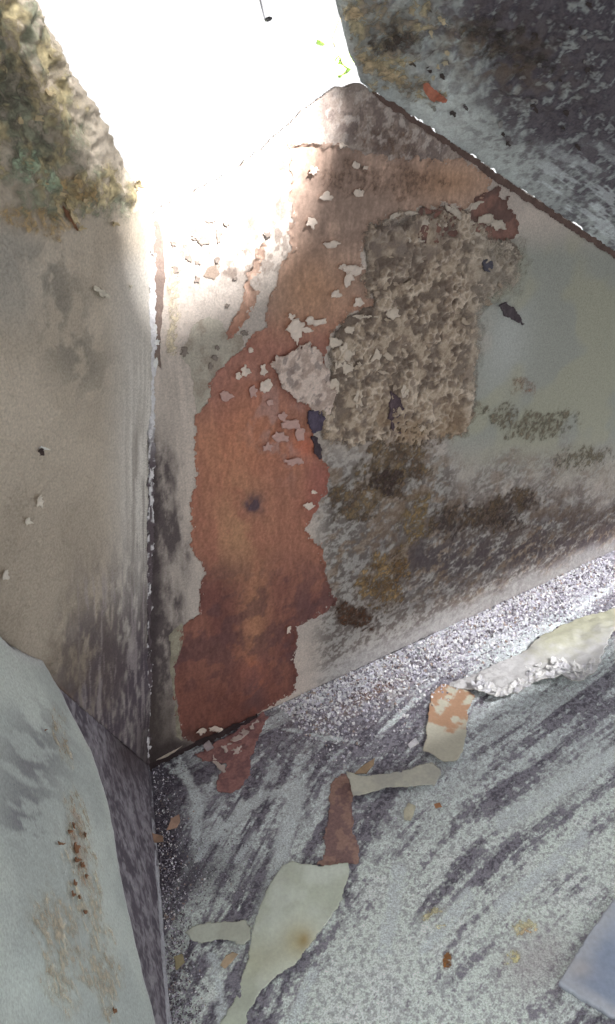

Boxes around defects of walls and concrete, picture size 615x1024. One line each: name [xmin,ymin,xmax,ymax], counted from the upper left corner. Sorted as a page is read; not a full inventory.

leakage [343,0,554,103]
leakage [0,0,137,241]
spalling [499,302,524,325]
peeling [157,140,520,793]
leakage [328,422,442,523]
leakage [428,487,544,541]
leakage [483,402,579,442]
leakage [553,446,611,471]
peeling [408,608,615,762]
corrosion [33,793,120,1019]